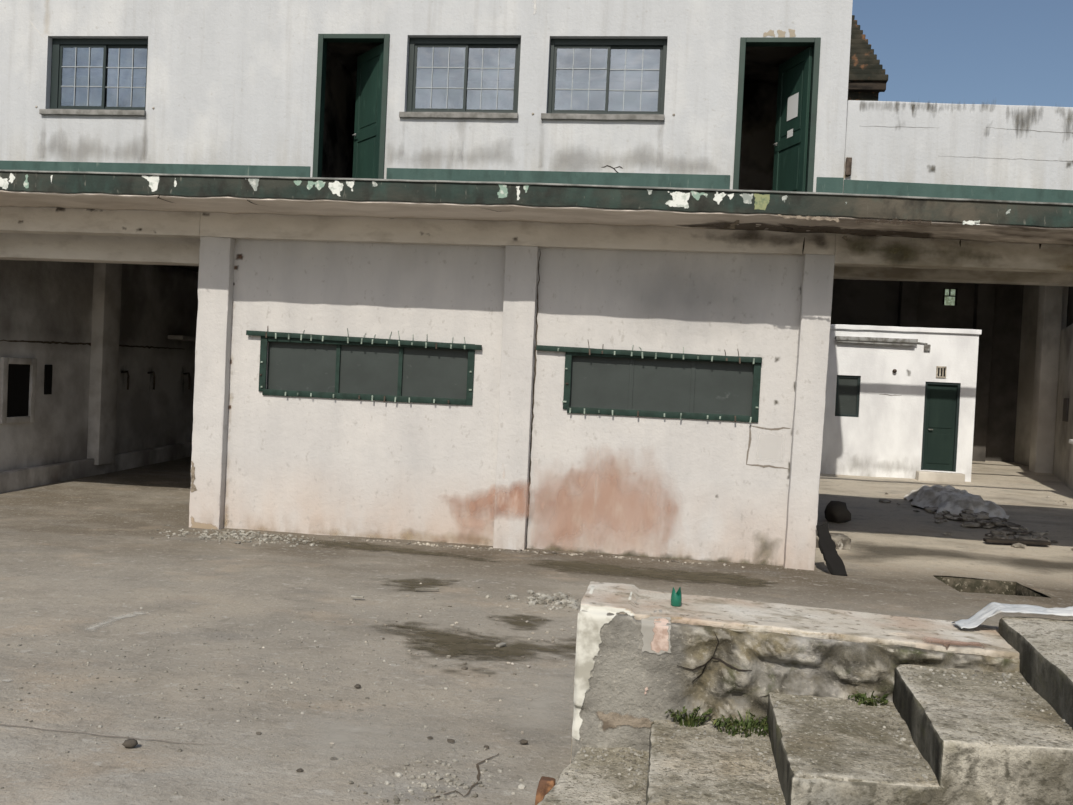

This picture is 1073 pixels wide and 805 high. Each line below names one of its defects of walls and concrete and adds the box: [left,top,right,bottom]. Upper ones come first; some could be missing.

peeling [0,173,29,190]
peeling [142,175,159,192]
peeling [294,180,355,196]
peeling [666,190,787,210]
spalling [778,214,839,222]
leakage [680,222,930,261]
leakage [384,615,576,671]
crack [677,632,752,682]